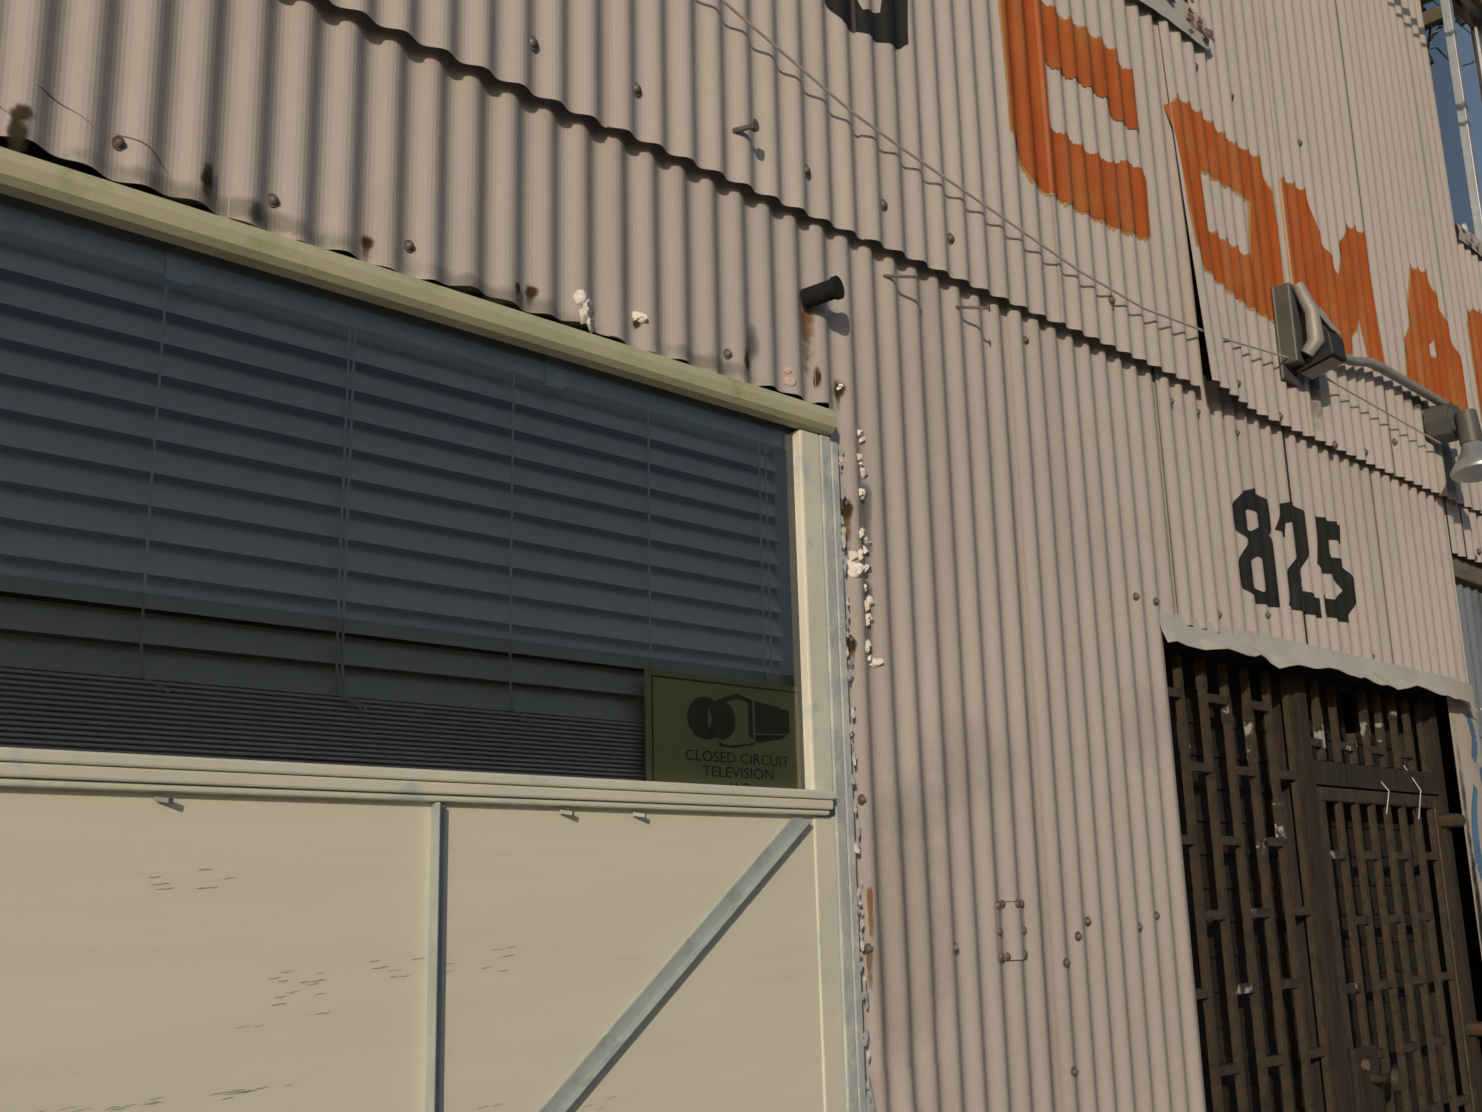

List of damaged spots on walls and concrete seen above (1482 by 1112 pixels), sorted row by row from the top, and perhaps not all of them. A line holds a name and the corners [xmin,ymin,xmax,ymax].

rust [202,163,213,192]
rust [361,236,373,256]
rust [515,283,538,300]
peeling [839,430,884,680]
peeling [849,700,860,853]